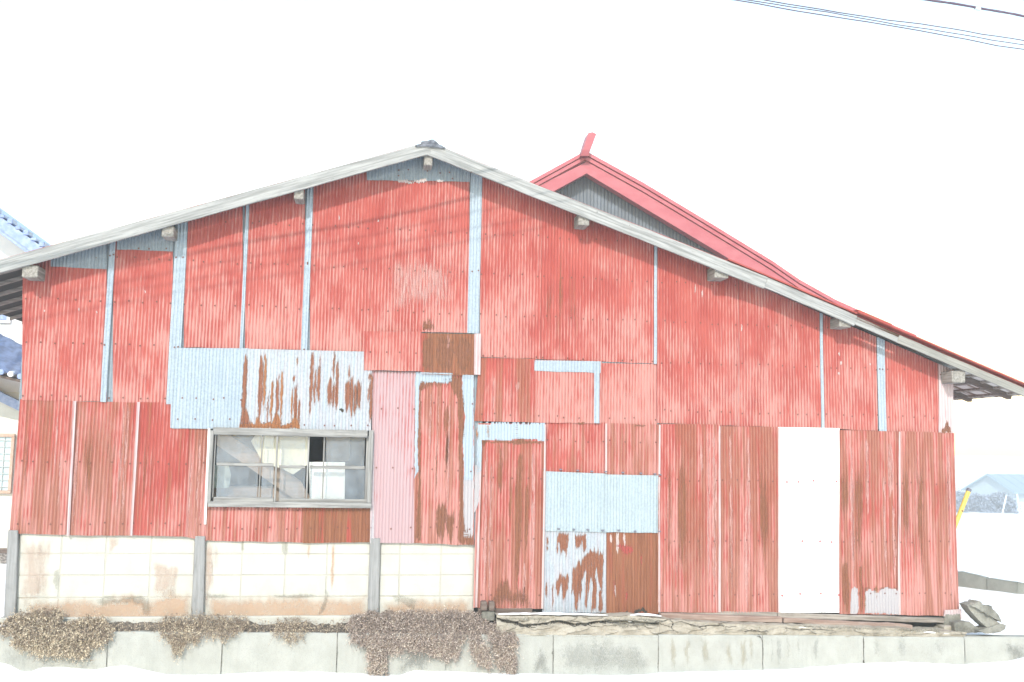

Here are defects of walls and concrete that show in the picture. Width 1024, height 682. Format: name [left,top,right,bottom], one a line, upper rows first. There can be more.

rust [239,352,373,429]
rust [415,319,542,606]
rust [545,532,604,613]
rust [667,471,698,568]
rust [759,463,768,550]
rust [841,474,877,612]
rust [903,477,924,569]